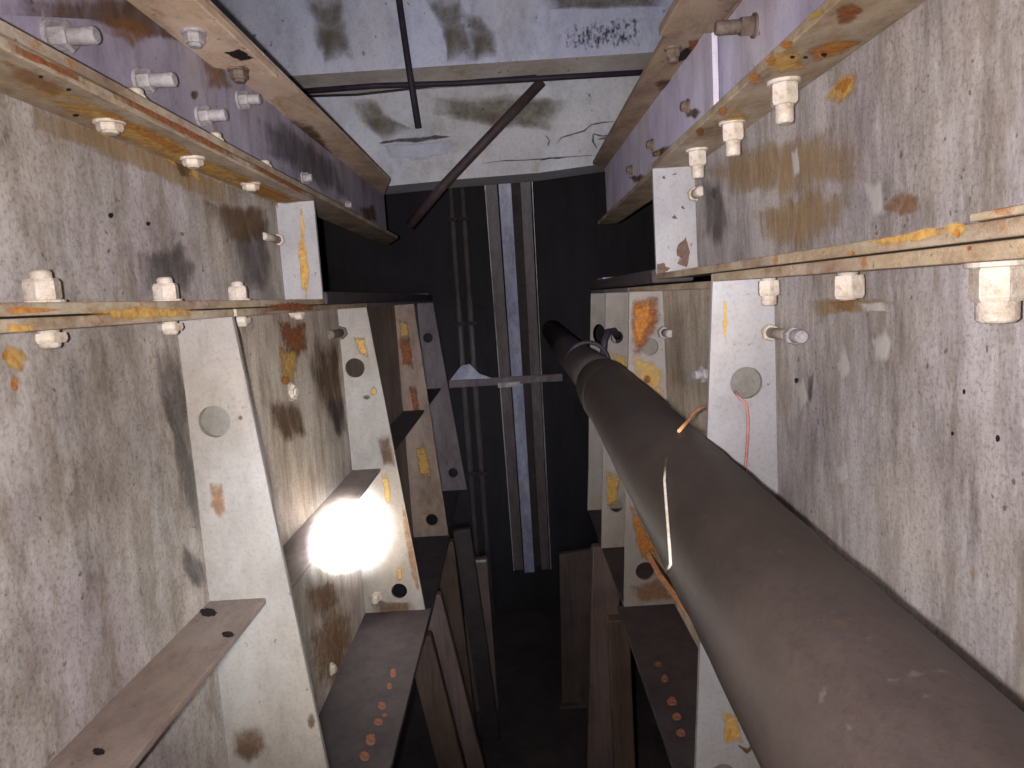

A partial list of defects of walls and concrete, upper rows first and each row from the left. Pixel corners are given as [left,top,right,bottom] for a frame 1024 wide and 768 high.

corrosion [53,0,175,45]
water stain [313,5,347,56]
water stain [432,5,493,55]
water stain [557,0,650,8]
corrosion [749,41,859,83]
water stain [367,104,449,160]
water stain [451,100,552,126]
crack [488,121,614,163]
corrosion [9,45,313,384]
corrosion [870,223,964,244]
corrosion [613,298,661,393]
corrosion [236,732,264,761]